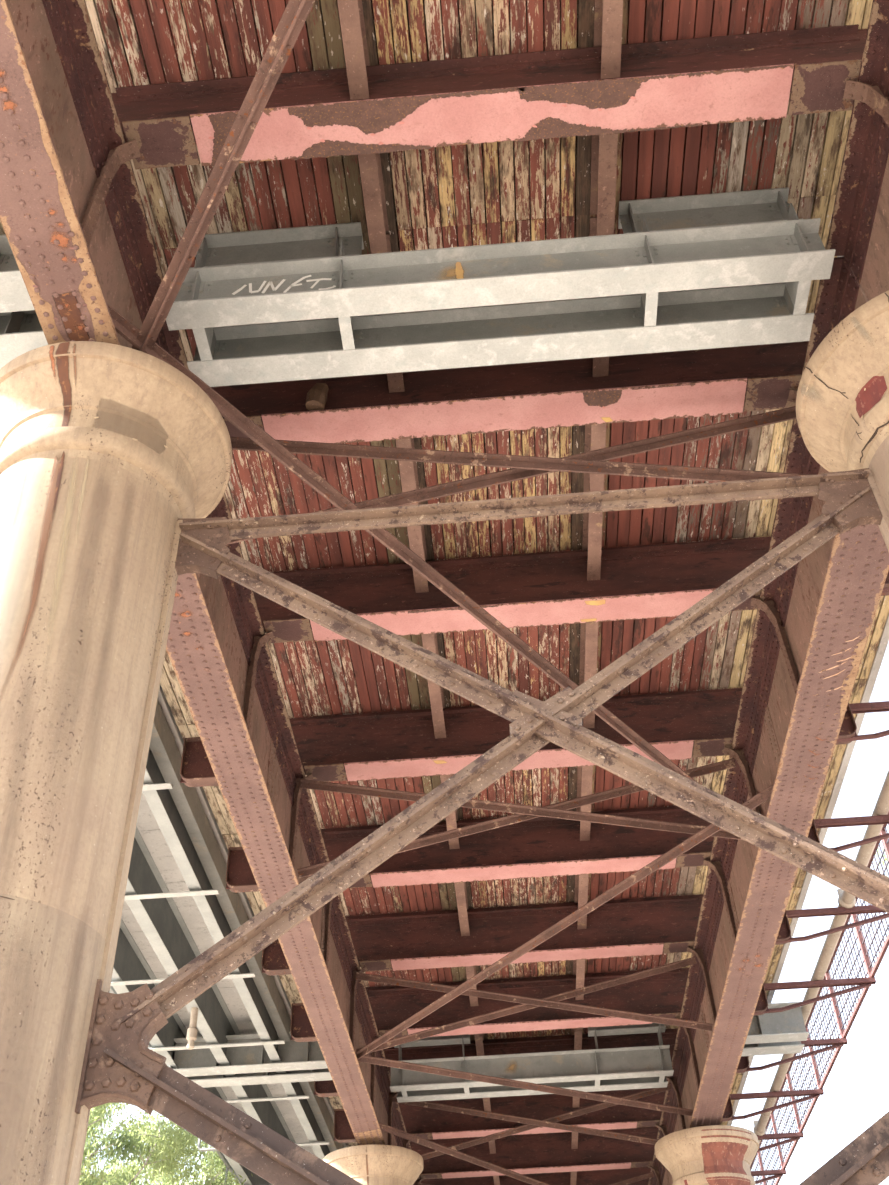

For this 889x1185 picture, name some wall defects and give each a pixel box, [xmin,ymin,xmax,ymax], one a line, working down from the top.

peeling [208,112,238,166]
peeling [288,65,787,161]
crack [806,367,889,463]
rust [16,452,65,658]
peeling [701,1129,751,1185]